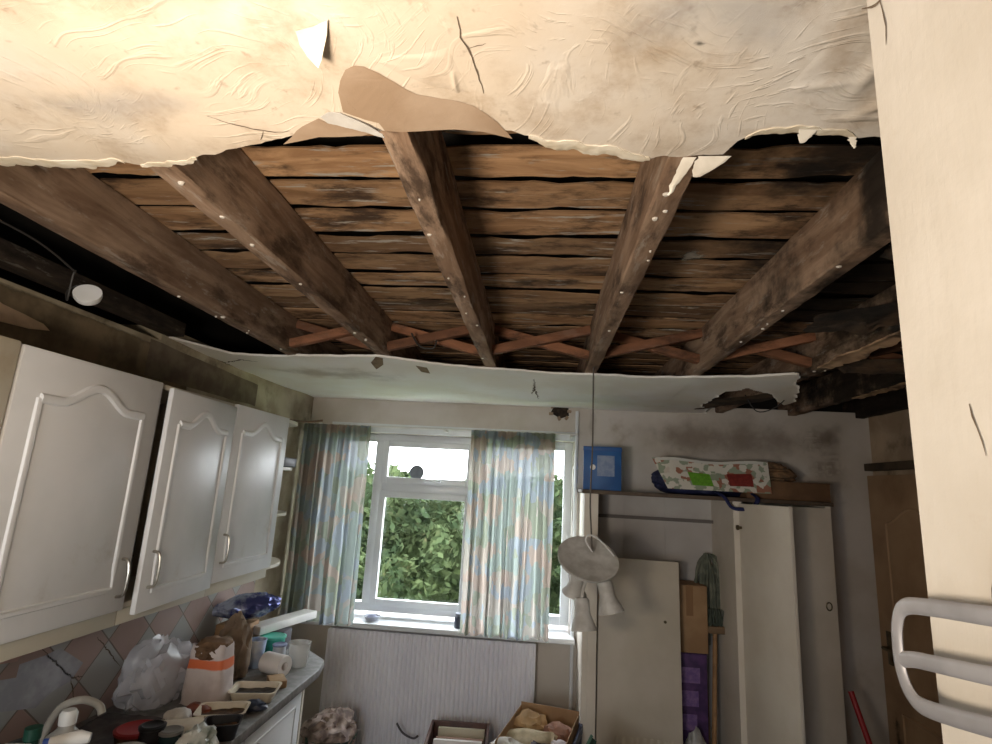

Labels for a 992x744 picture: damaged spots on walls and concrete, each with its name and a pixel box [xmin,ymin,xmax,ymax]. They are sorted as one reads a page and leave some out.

crack [861,0,886,38]
peeling [295,20,328,68]
crack [457,17,486,94]
spalling [284,66,512,144]
spalling [0,156,125,169]
spalling [140,157,198,168]
spalling [529,135,650,162]
spalling [745,125,855,140]
flaking render [0,283,186,390]
spalling [371,357,383,369]